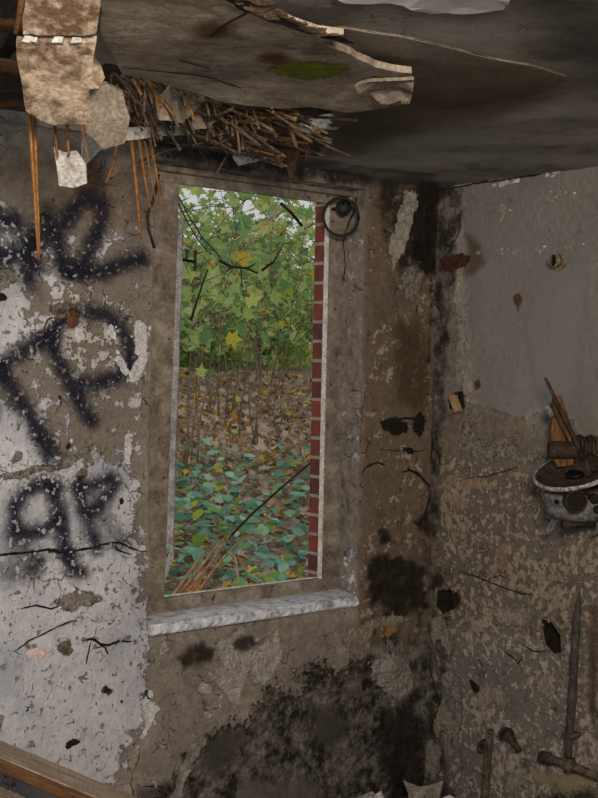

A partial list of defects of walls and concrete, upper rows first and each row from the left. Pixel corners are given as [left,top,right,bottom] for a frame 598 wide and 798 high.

peeling [339,0,511,15]
peeling [336,26,566,109]
damp [408,187,440,282]
peeling [105,320,152,383]
crack [362,417,440,539]
crack [0,541,147,561]
damp [368,556,428,615]
flaking render [14,586,103,661]
crack [81,635,132,664]
damp [234,636,255,651]
flaking render [149,586,480,798]
damp [376,703,426,798]